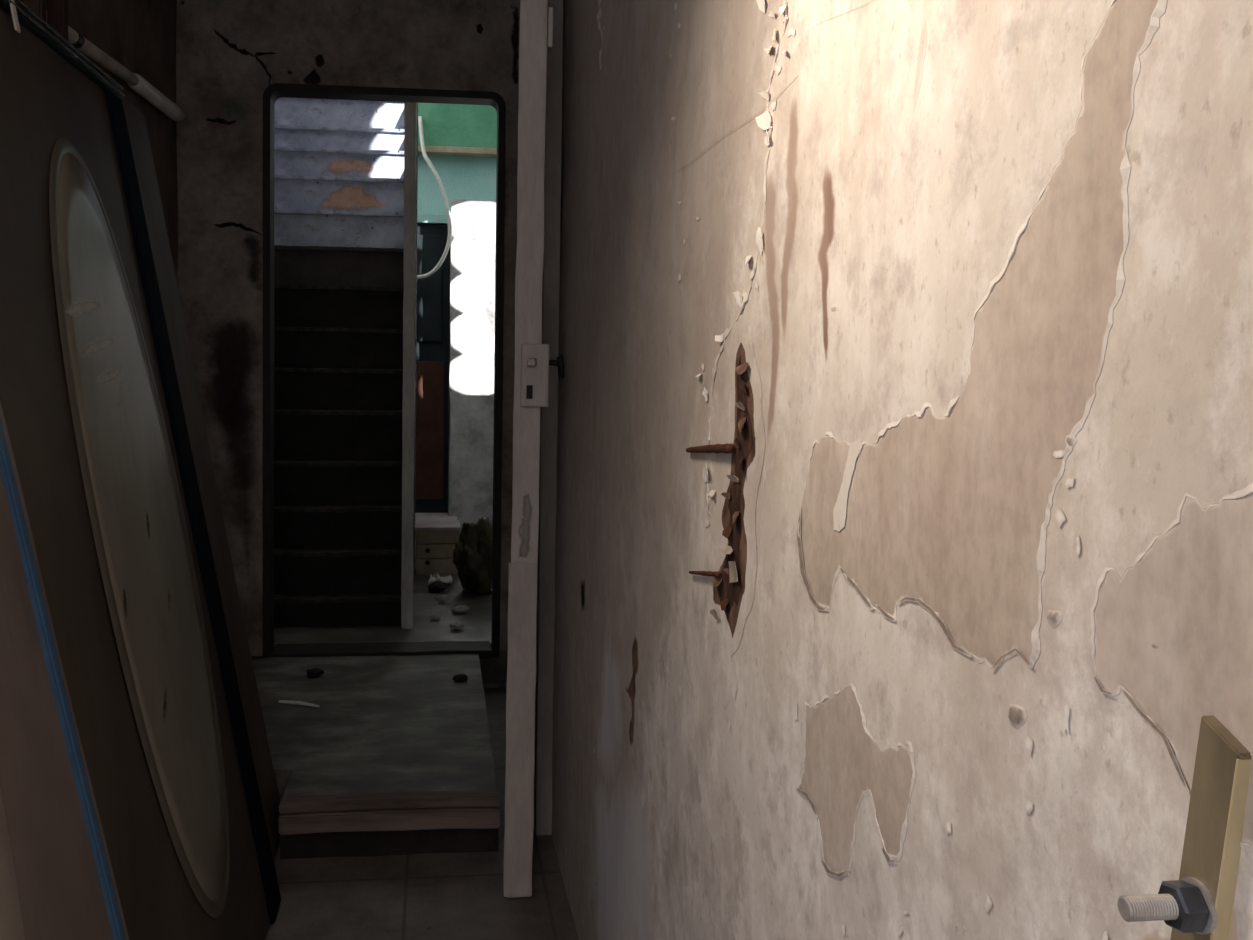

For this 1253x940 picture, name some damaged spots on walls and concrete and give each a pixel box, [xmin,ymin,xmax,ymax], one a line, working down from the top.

crack [205,117,238,126]
crack [213,222,263,314]
crack [211,27,280,86]
peeling [695,0,795,445]
rust [816,158,838,373]
peeling [796,0,1167,671]
leakage [191,301,263,641]
peeling [1091,483,1253,853]
peeling [795,682,916,878]